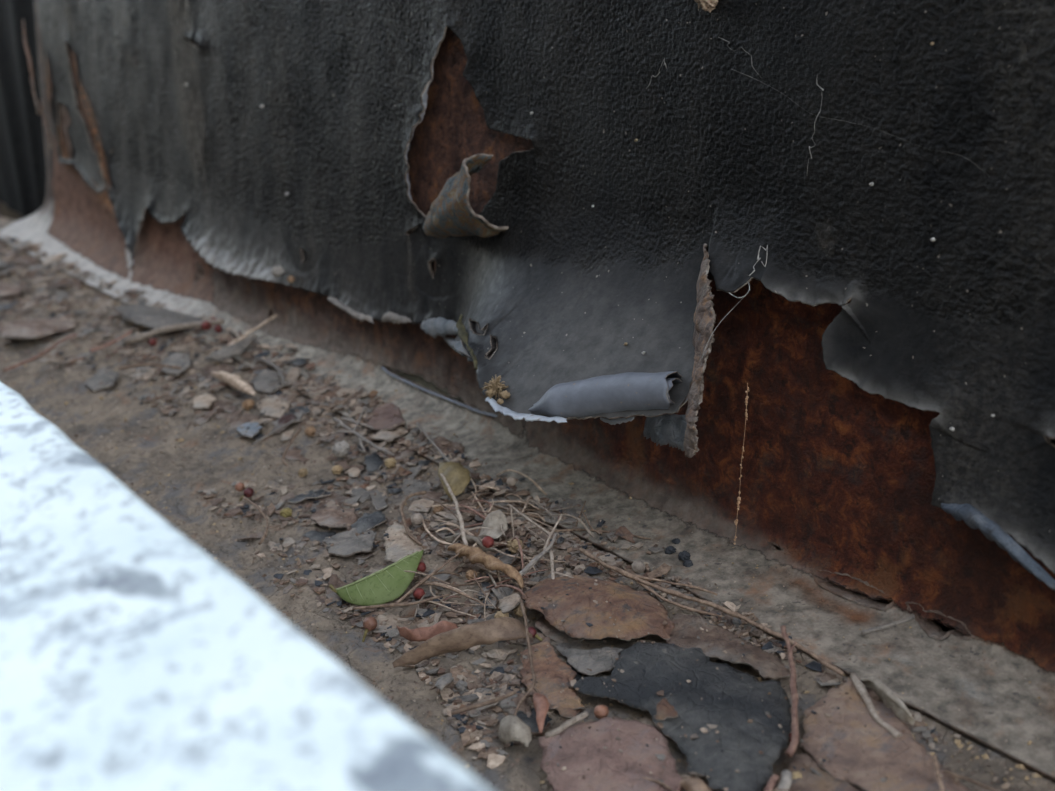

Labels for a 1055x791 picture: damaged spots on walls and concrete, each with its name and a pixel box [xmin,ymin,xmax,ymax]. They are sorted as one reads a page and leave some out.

peeling [22,19,52,149]
peeling [404,27,534,239]
corrosion [0,318,77,339]
corrosion [47,82,1055,674]
peeling [485,243,716,458]
peeling [941,503,1055,590]